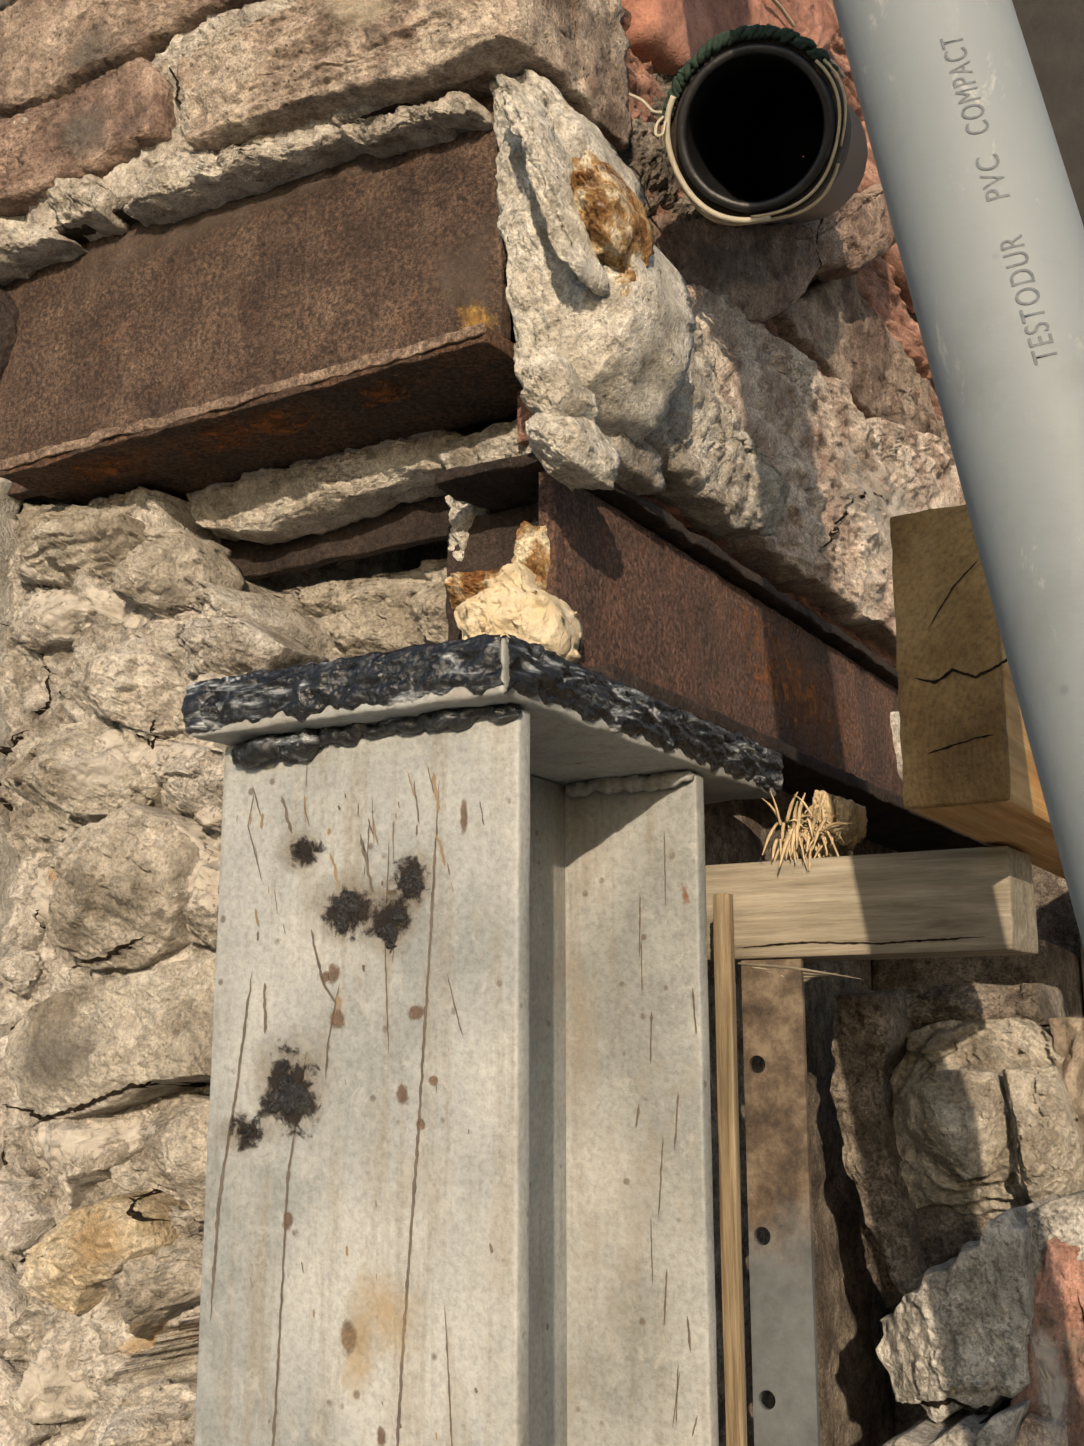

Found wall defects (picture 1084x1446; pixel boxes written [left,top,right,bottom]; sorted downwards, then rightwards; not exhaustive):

crack [0,623,65,828]
crack [71,936,144,968]
crack [2,1081,210,1125]